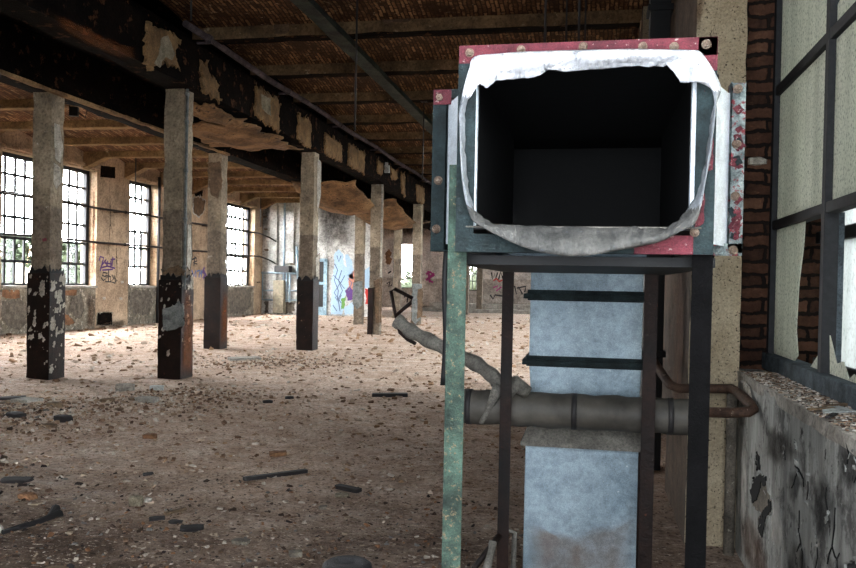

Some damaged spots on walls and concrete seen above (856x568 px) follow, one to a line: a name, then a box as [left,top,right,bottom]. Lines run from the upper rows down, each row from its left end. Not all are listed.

flaking render [142,21,182,72]
flaking render [199,59,222,105]
flaking render [253,84,281,134]
flaking render [296,112,366,217]
flaking render [376,157,425,205]
peeling [119,161,223,345]
peeling [0,273,85,374]
peeling [750,451,773,539]
crack [781,439,840,568]
crack [844,445,856,483]